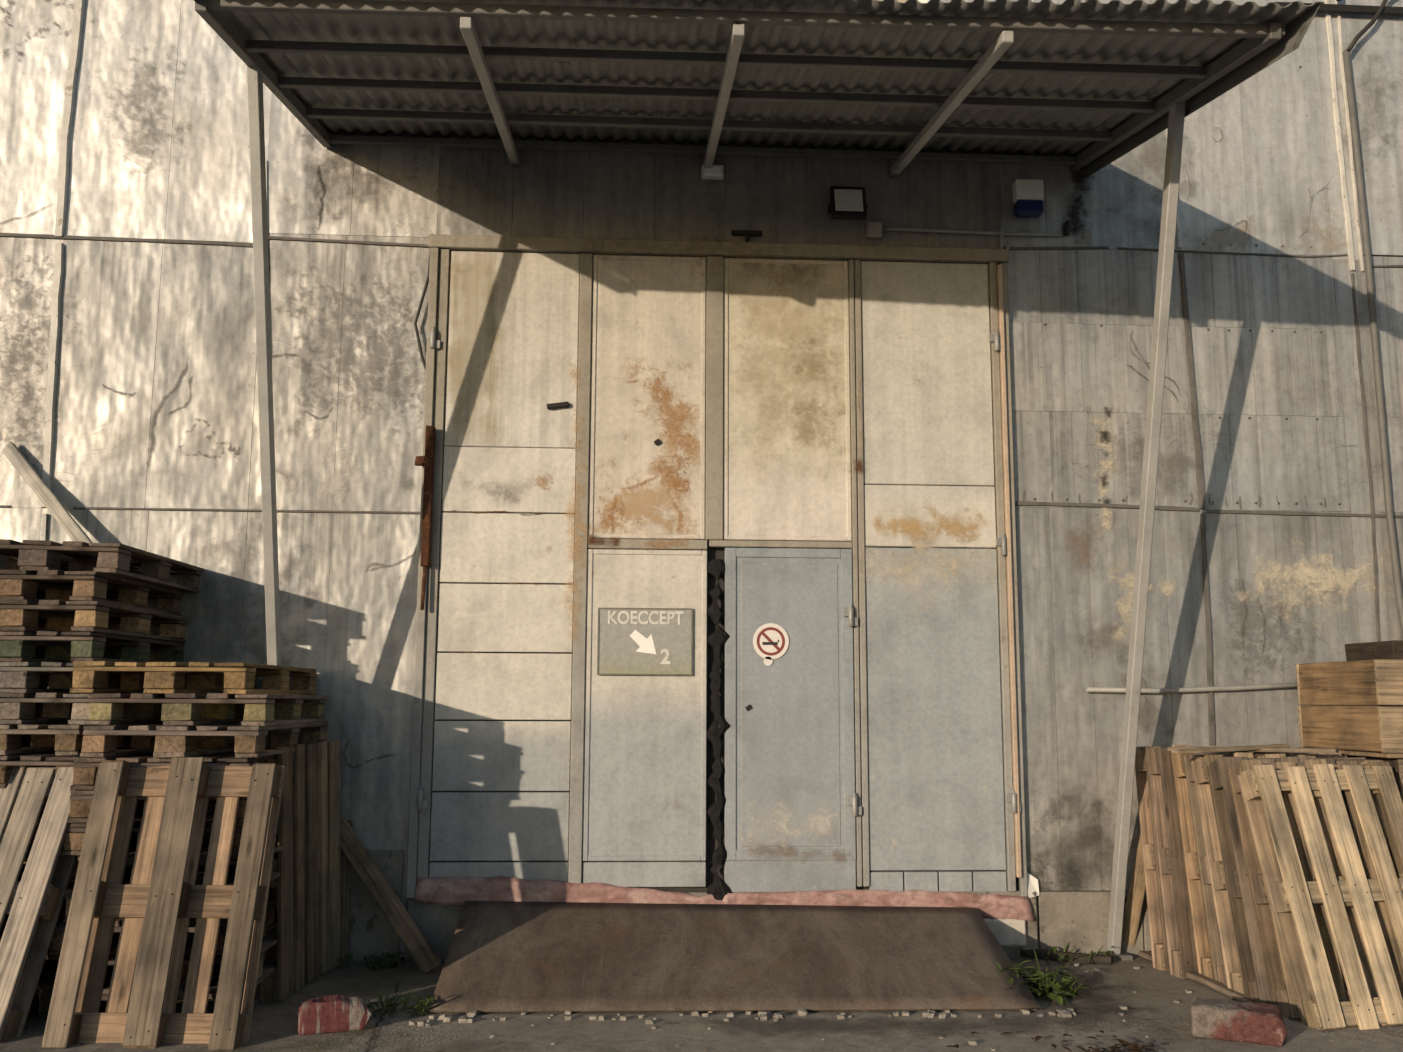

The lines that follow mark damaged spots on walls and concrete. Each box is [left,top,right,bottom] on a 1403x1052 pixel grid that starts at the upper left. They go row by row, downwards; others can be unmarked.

corrosion [566,386,700,559]
corrosion [876,519,975,545]